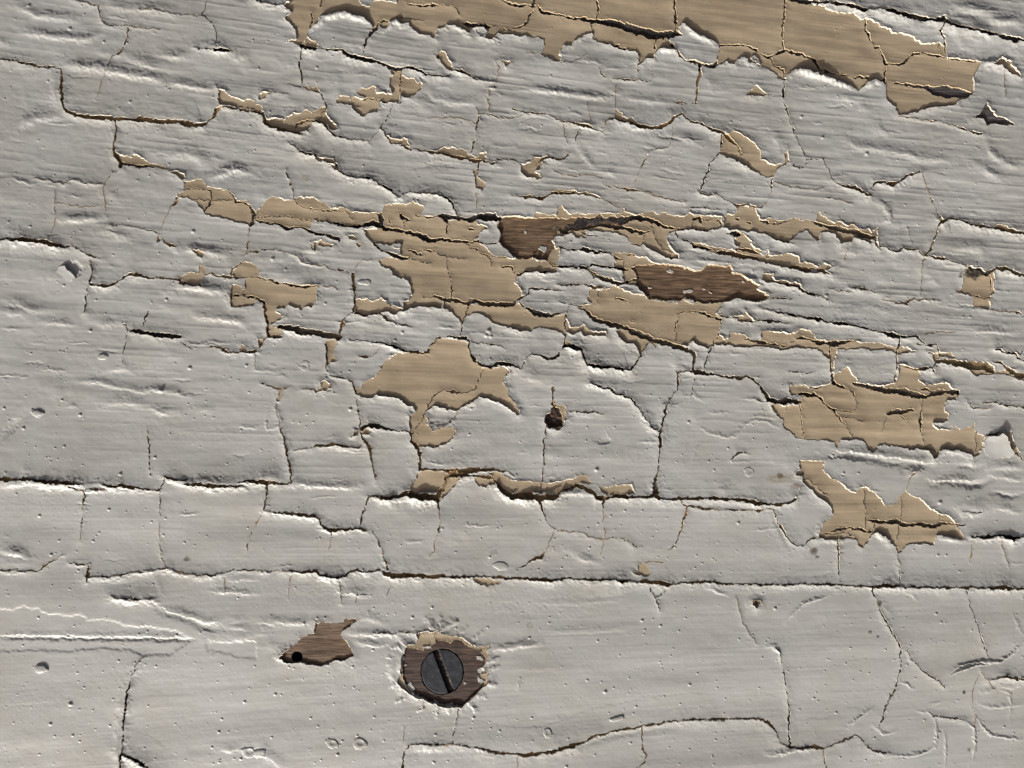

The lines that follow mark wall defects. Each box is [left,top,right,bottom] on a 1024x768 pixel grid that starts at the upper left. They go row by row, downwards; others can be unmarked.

peeling [218,69,422,134]
crack [502,0,680,41]
peeling [285,0,981,118]
crack [789,0,1024,56]
crack [0,23,851,309]
crack [766,59,1024,306]
peeling [118,155,1024,458]
crack [0,220,1024,726]
peeling [796,460,964,553]
peeling [280,618,357,666]
peeling [397,630,489,708]
crack [401,650,891,768]